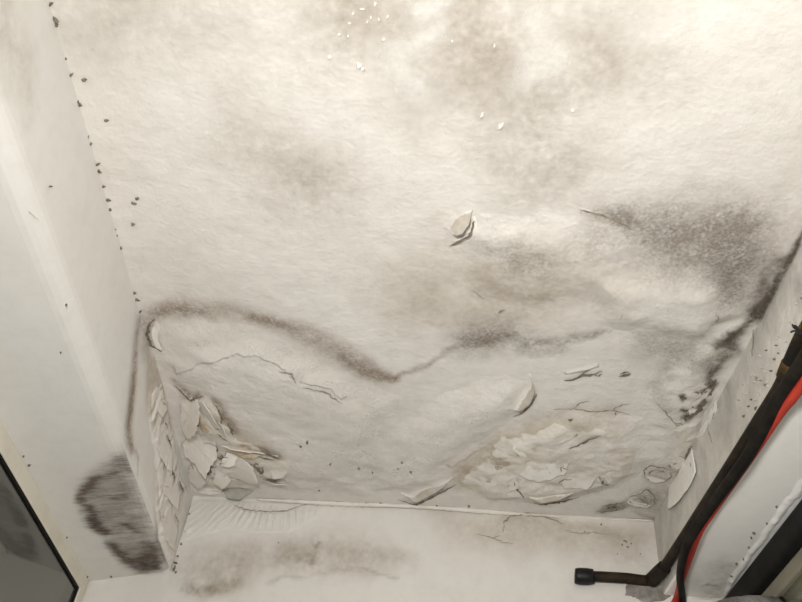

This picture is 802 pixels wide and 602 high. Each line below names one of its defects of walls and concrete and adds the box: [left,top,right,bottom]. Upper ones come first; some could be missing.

peeling [449,210,477,246]
damp [665,222,741,286]
damp [707,233,802,381]
damp [76,464,161,571]
flaking render [148,340,348,574]
flaking render [399,374,638,506]
flaking render [602,378,721,512]